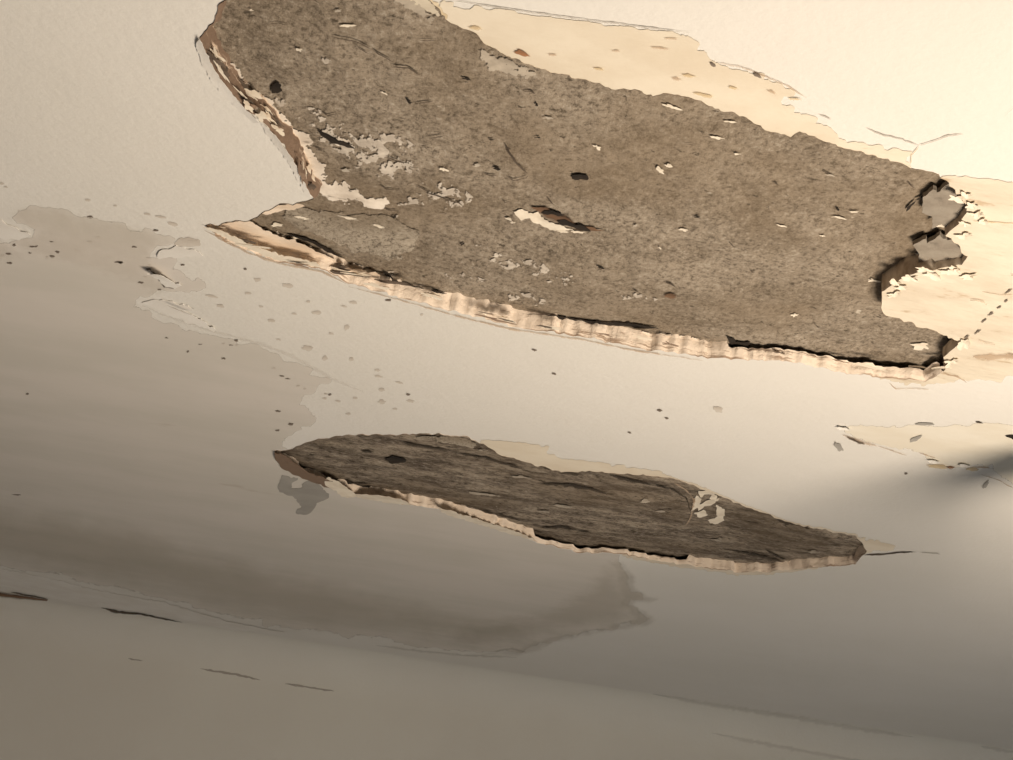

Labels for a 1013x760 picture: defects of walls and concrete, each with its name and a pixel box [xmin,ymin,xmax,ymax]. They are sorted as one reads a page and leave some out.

spalling [196,0,1013,390]
peeling [0,205,910,653]
peeling [834,422,1013,488]
damp [278,475,329,515]
crack [0,592,47,601]